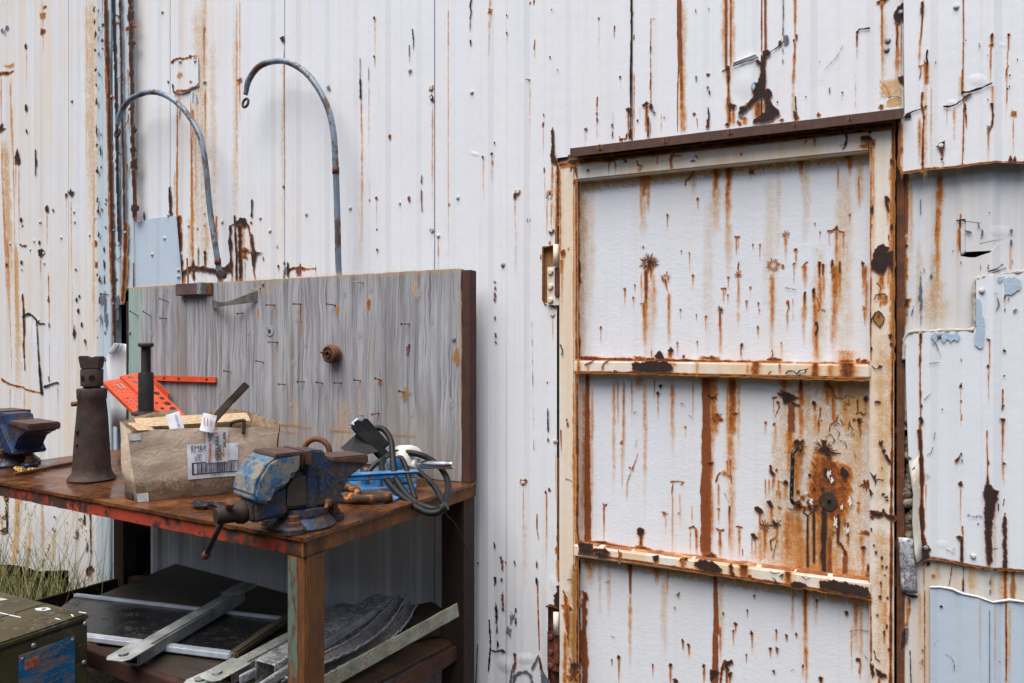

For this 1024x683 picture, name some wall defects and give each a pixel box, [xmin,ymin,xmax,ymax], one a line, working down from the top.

rust [5,110,27,370]
rust [93,0,140,343]
rust [174,81,264,281]
rust [543,0,1024,683]
peeling [974,298,985,349]